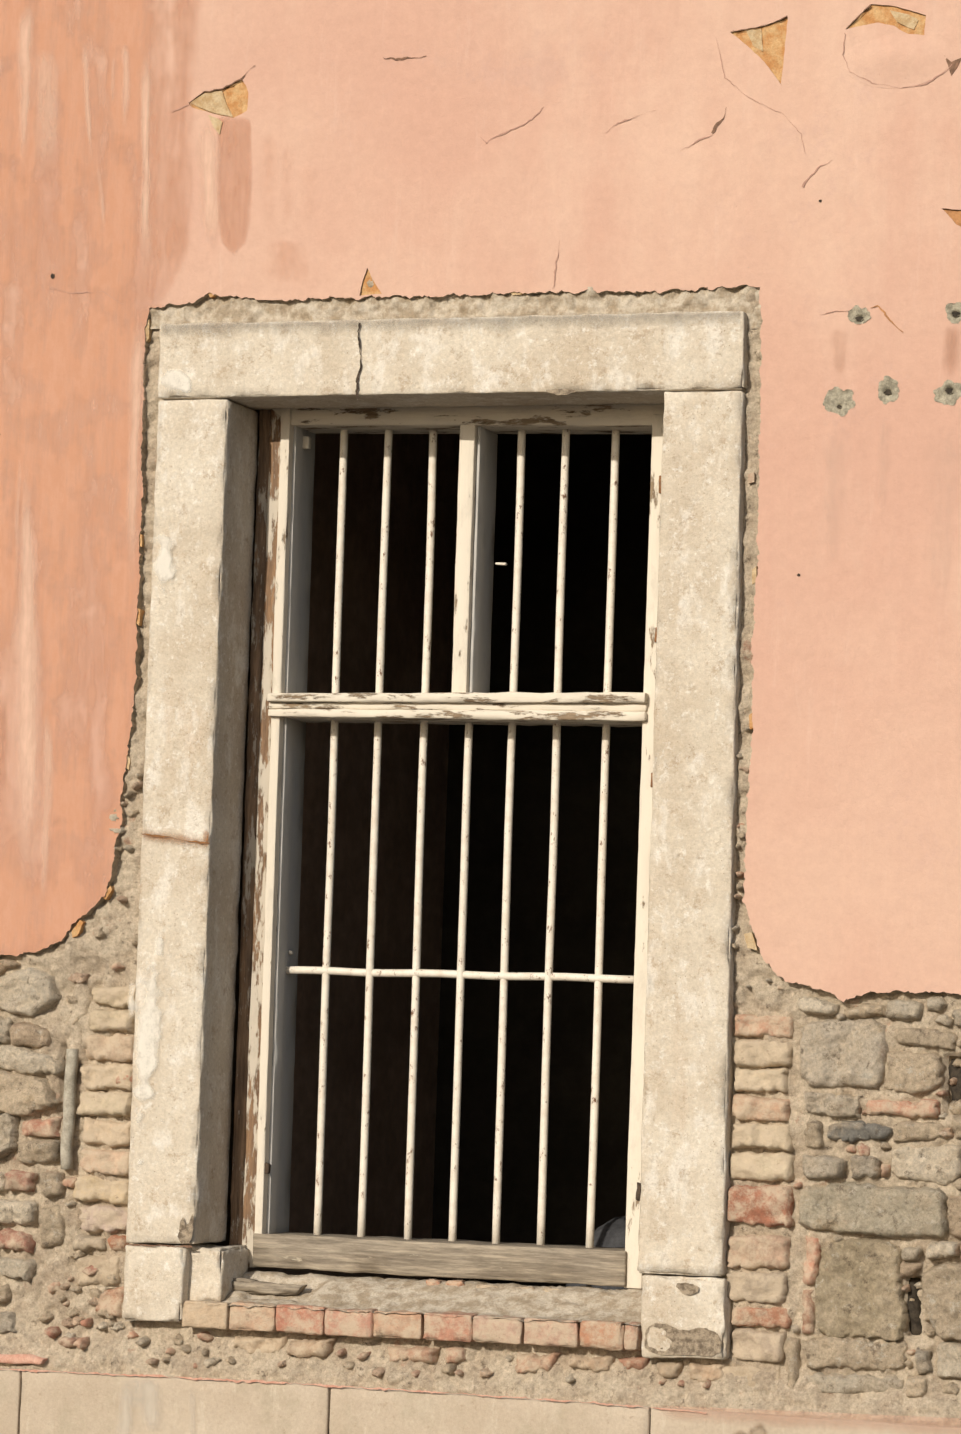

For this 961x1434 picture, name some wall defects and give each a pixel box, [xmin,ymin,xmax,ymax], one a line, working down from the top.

spalling [172,65,255,135]
crack [683,39,829,187]
spalling [731,16,788,84]
spalling [847,5,926,35]
peeling [944,55,961,76]
damp [204,121,247,242]
spalling [943,209,961,226]
spalling [361,270,382,296]
crack [354,323,362,399]
damp [0,0,182,957]
spalling [0,285,961,1427]